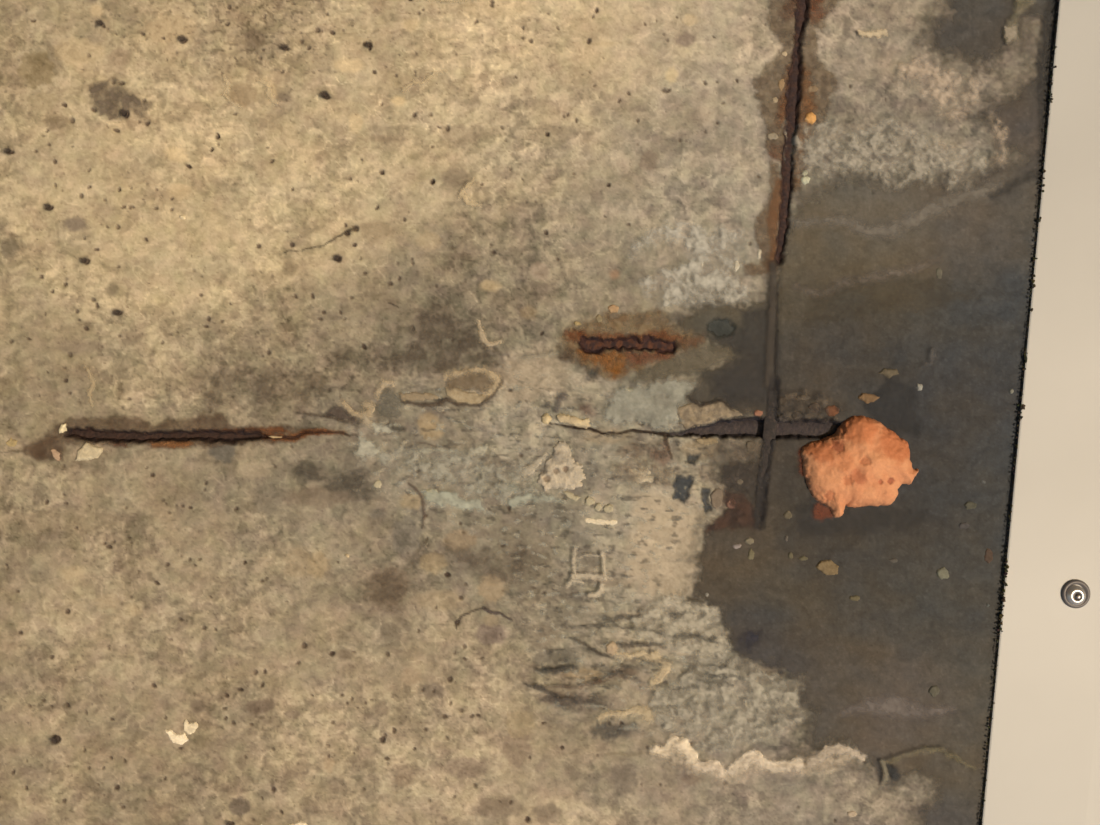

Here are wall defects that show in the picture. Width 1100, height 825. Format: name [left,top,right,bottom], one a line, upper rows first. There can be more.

corrosion [745,0,837,275]
spalling [578,335,678,354]
corrosion [560,311,732,381]
corrosion [23,414,334,460]
leakage [541,392,591,429]
leakage [605,0,1059,825]